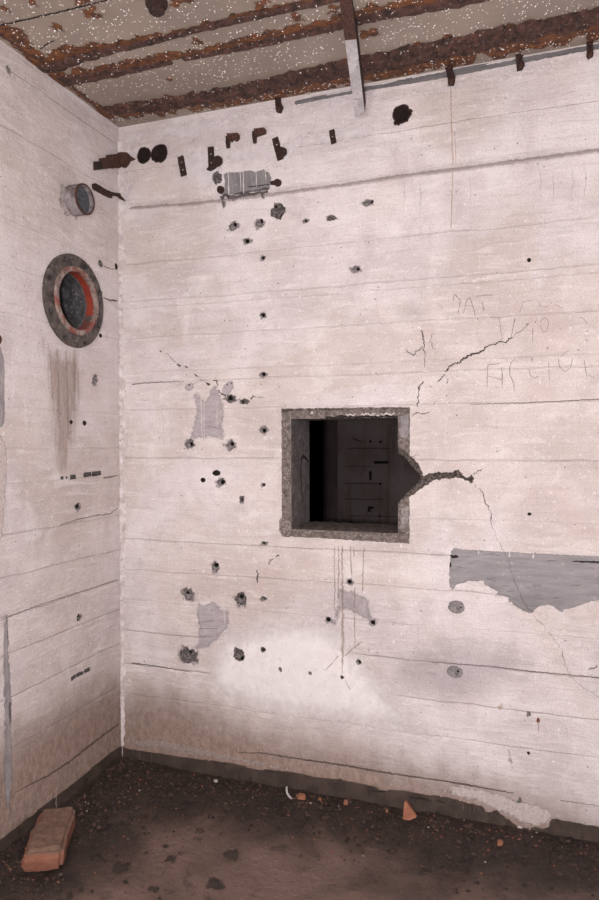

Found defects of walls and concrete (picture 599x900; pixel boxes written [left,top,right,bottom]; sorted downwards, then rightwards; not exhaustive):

corrosion [0,0,351,123]
corrosion [355,0,491,39]
corrosion [361,7,599,82]
crack [408,324,529,417]
peeling [184,381,250,451]
crack [434,469,599,696]
peeling [447,548,599,616]
peeling [179,587,229,665]